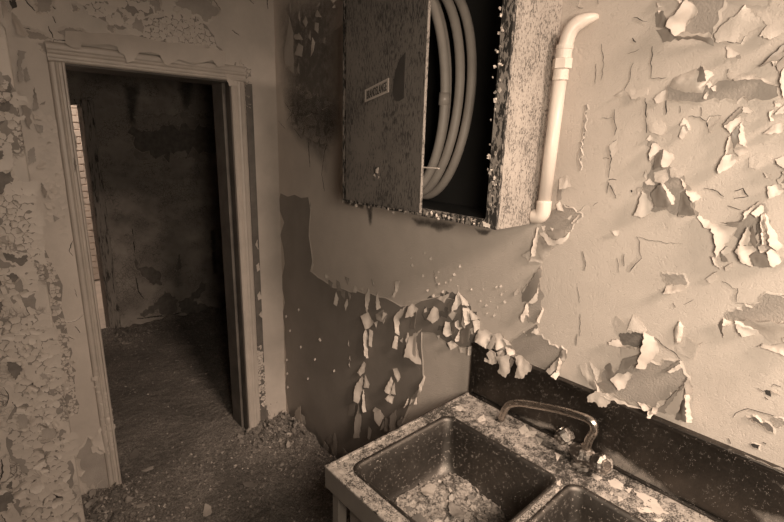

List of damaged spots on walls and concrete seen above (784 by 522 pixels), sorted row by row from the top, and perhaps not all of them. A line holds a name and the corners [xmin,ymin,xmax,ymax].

crack [594,44,604,83]
crack [622,17,666,91]
crack [643,98,721,133]
crack [576,104,618,206]
peeling [630,45,784,284]
peeling [0,50,116,522]
peeling [279,174,587,440]
peeling [660,271,690,294]
spalling [718,291,784,356]
peeling [579,315,703,423]
spalling [733,408,784,435]
spalling [744,442,784,476]